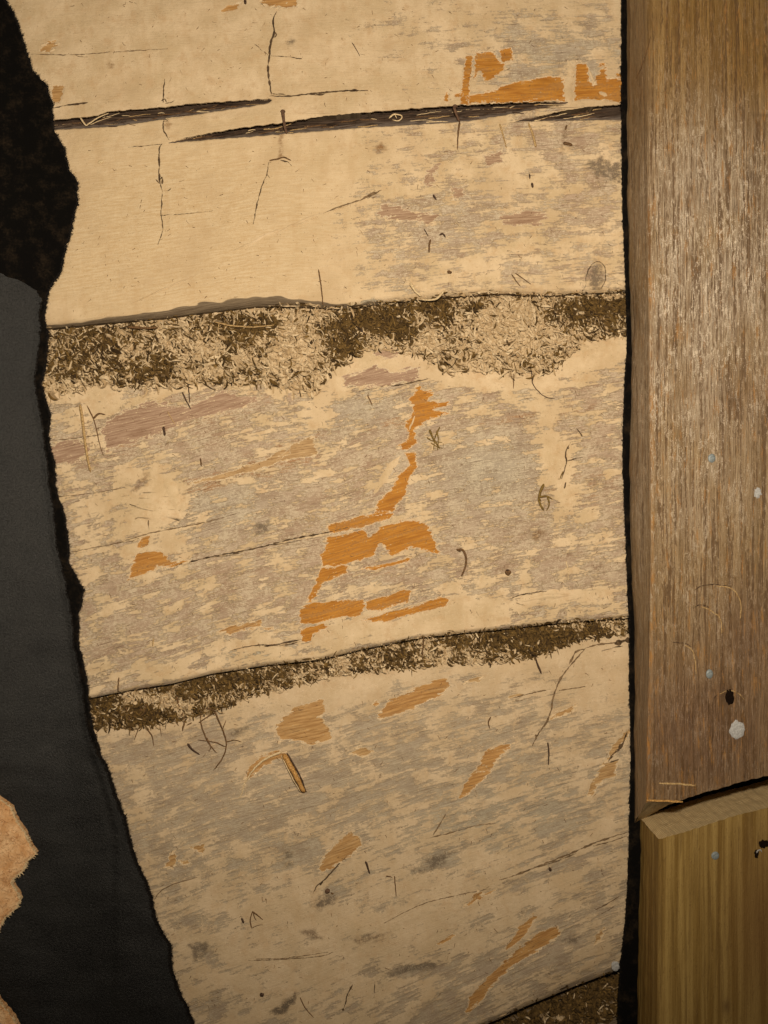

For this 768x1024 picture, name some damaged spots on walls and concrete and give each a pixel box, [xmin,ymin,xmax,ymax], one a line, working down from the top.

peeling [442,47,622,106]
crack [38,13,621,243]
peeling [298,347,451,643]
crack [72,513,237,552]
peeling [126,535,191,581]
crack [179,527,348,565]
peeling [372,675,484,721]
peeling [242,697,332,783]
peeling [458,741,515,799]
peeling [317,831,363,874]
peeling [464,913,561,1014]